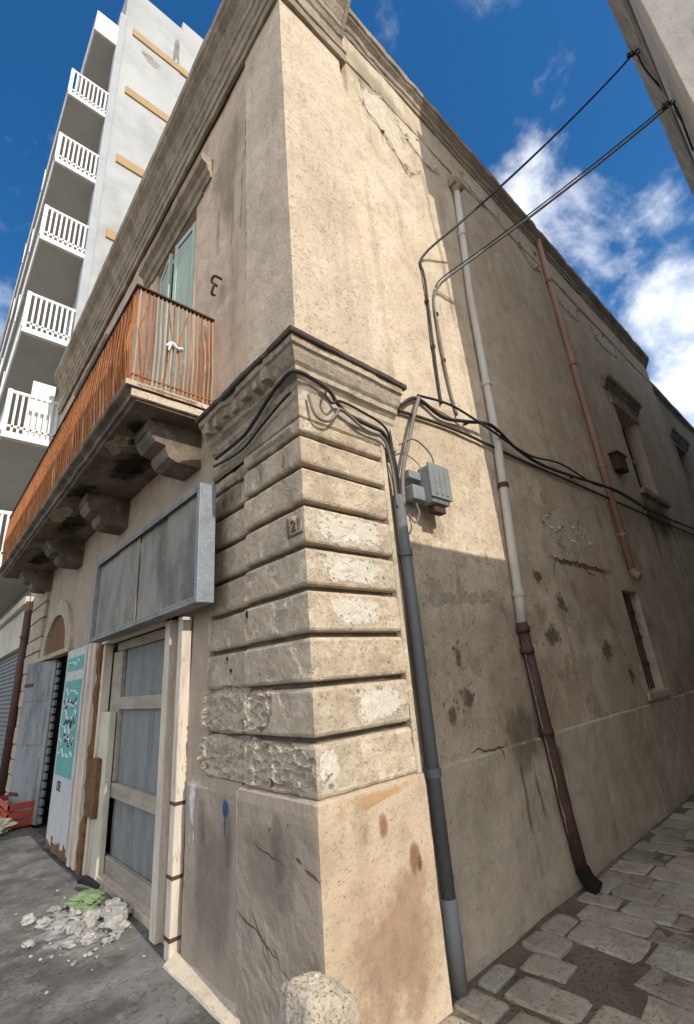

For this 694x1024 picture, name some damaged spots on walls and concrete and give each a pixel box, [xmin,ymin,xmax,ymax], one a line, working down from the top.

water stain [111,419,156,480]
crack [550,554,606,576]
water stain [443,681,475,724]
spalling [197,657,339,793]
crack [472,746,505,757]
crack [255,843,321,885]
crack [237,910,289,990]